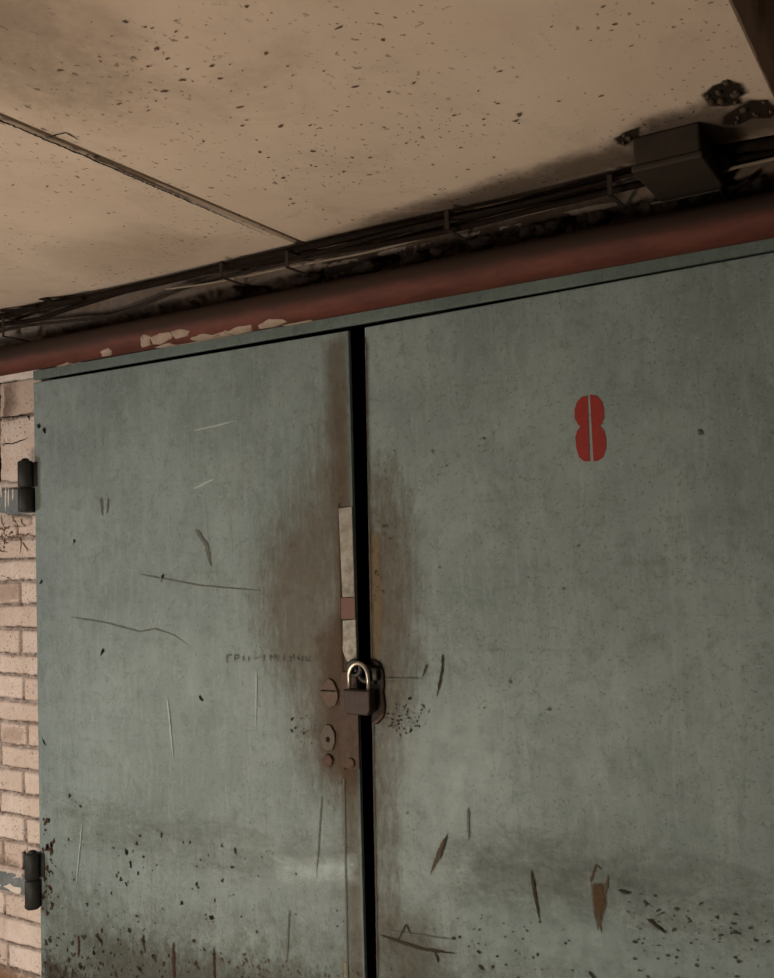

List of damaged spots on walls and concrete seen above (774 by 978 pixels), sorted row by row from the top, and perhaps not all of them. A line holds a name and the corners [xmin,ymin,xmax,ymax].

peeling [140,319,316,348]